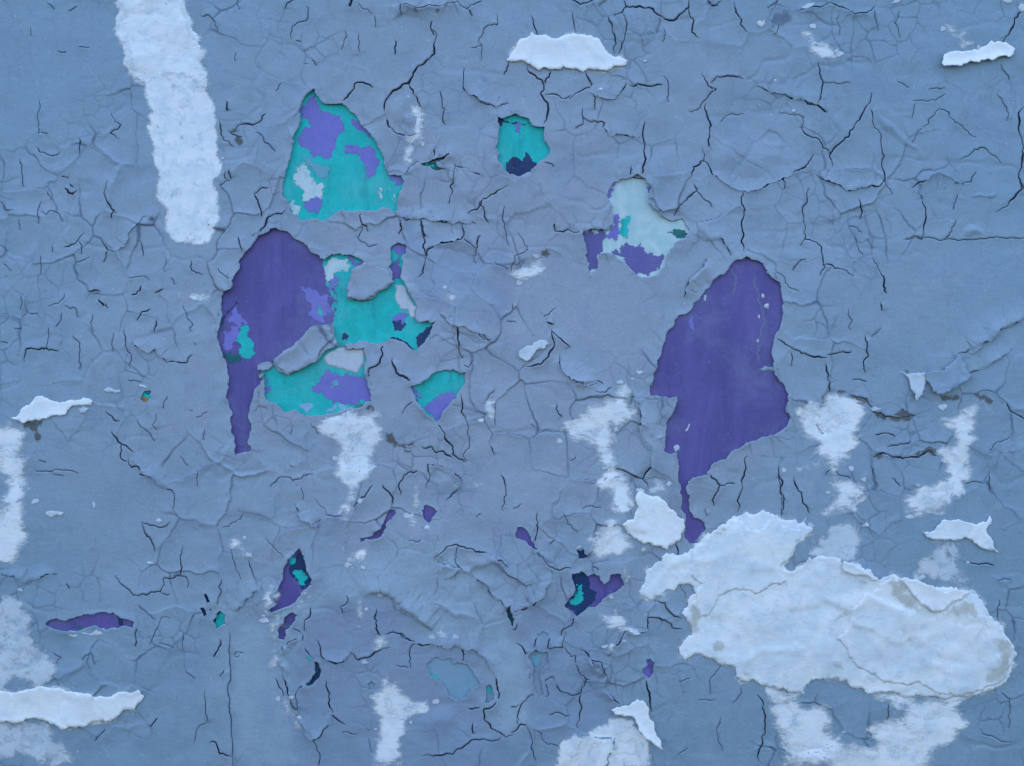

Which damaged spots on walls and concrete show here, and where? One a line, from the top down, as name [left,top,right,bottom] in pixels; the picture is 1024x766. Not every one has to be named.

peeling [42,609,138,638]
crack [0,100,233,384]
crack [105,395,243,758]
crack [217,82,282,187]
peeling [197,544,315,766]
peeling [213,86,496,458]
crack [269,304,682,766]
peeling [463,80,554,179]
peeling [561,545,628,620]
crack [341,0,1024,489]
peeling [579,171,794,547]
crack [776,465,811,519]